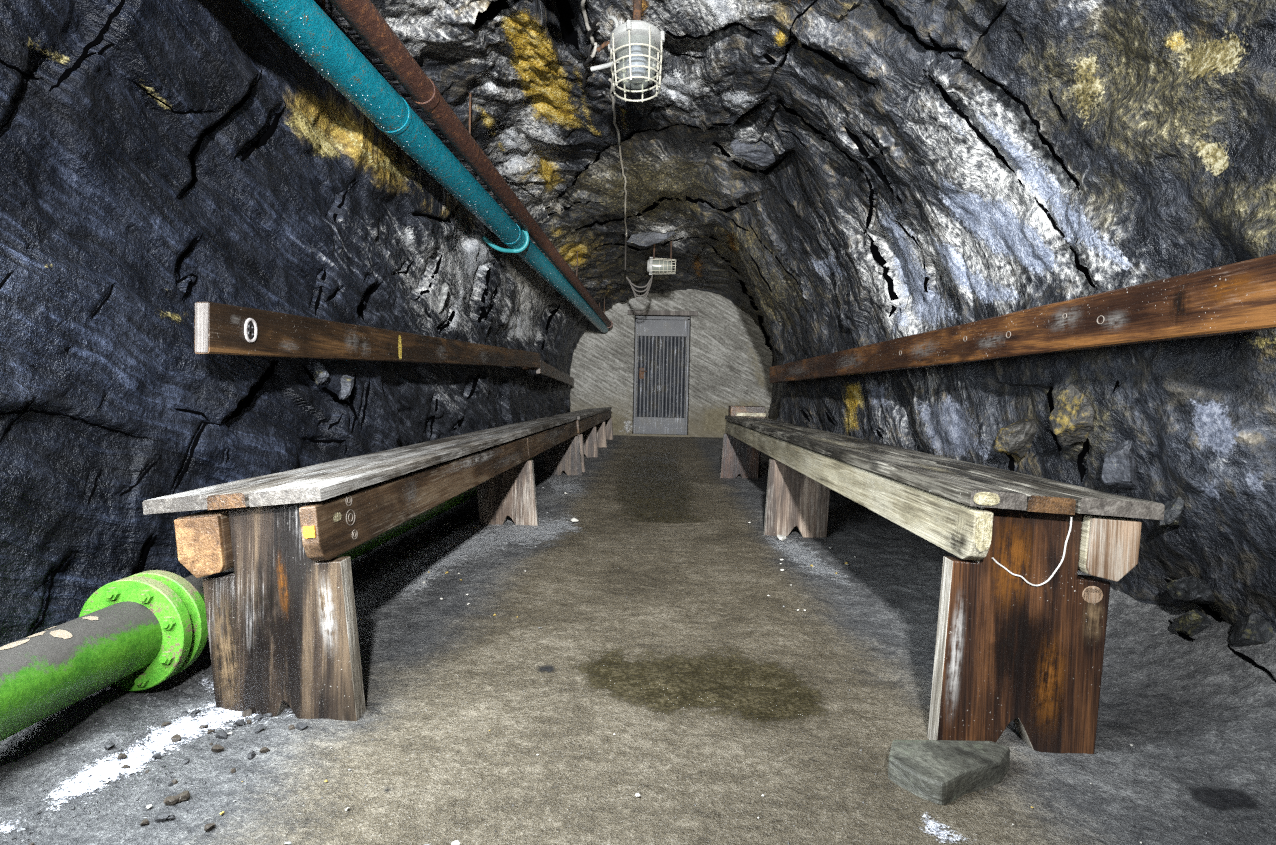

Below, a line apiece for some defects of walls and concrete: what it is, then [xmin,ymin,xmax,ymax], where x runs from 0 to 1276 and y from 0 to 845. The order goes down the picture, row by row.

water stain [568,645,828,728]